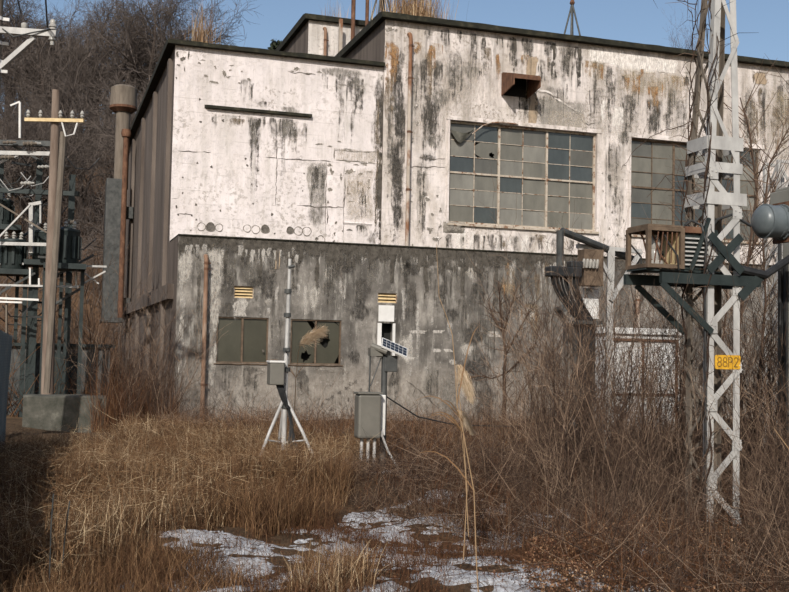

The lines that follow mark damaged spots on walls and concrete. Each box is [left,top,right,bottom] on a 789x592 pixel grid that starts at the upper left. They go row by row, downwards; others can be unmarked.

corrosion [414,42,443,96]
damp [413,35,582,161]
damp [589,63,677,222]
damp [177,54,579,418]
damp [603,258,626,279]